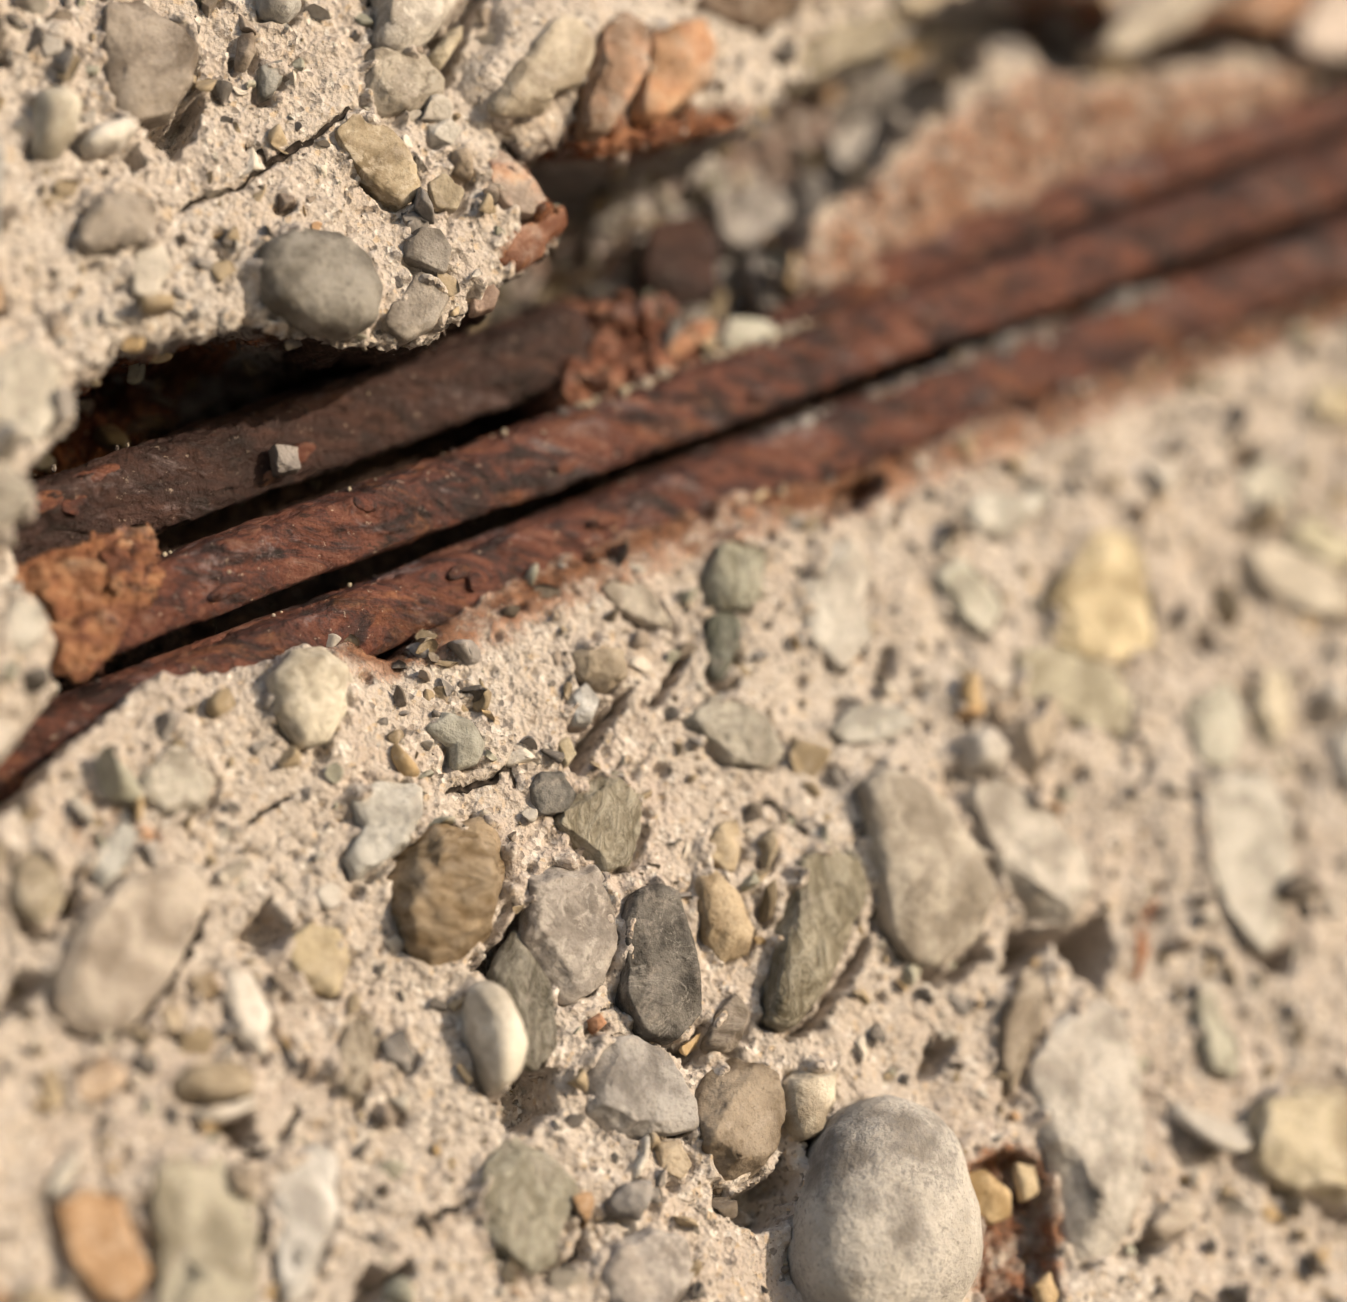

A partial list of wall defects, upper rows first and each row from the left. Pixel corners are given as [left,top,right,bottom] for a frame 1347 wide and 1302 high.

rust [1180,2,1301,53]
rust [517,103,751,177]
rust [528,197,560,224]
rust [28,338,264,478]
spalling [0,0,1347,816]
rust [330,282,1347,681]
rust [12,523,165,683]